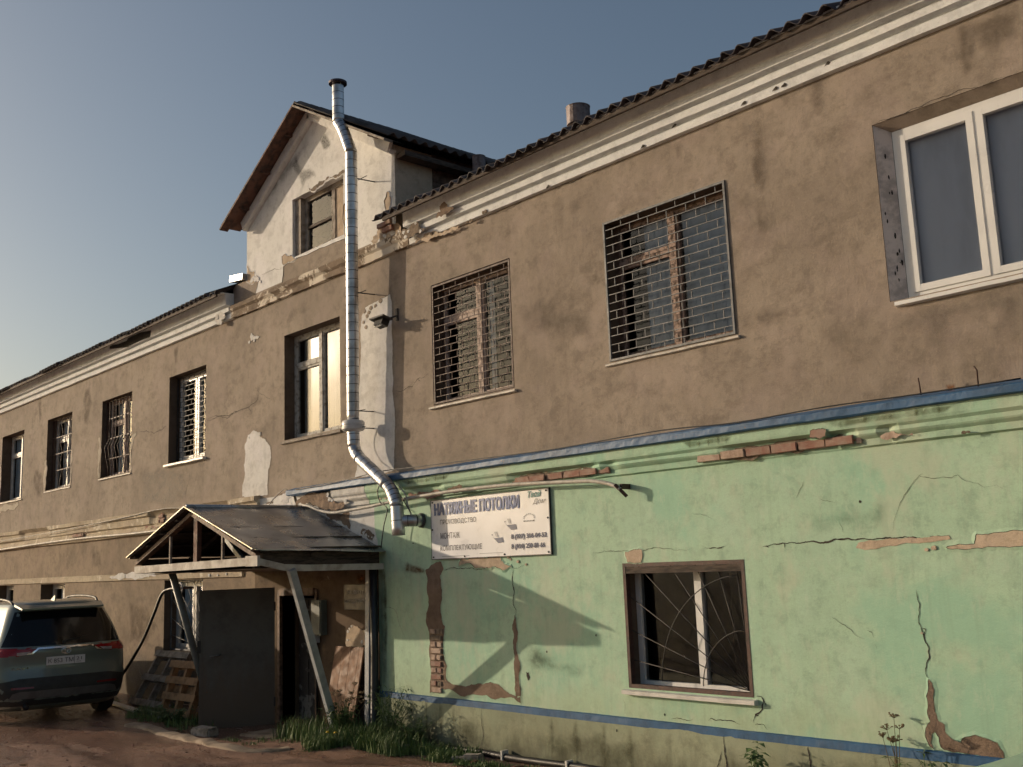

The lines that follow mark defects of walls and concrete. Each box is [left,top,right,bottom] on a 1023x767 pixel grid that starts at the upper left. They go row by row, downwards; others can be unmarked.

flaking render [242,429,376,542]
flaking render [512,467,611,483]
flaking render [696,428,864,463]
crack [763,474,1008,547]
flaking render [624,546,645,564]
flaking render [345,623,365,647]
flaking render [424,556,530,705]
crack [916,592,930,676]
flaking render [922,676,1008,758]